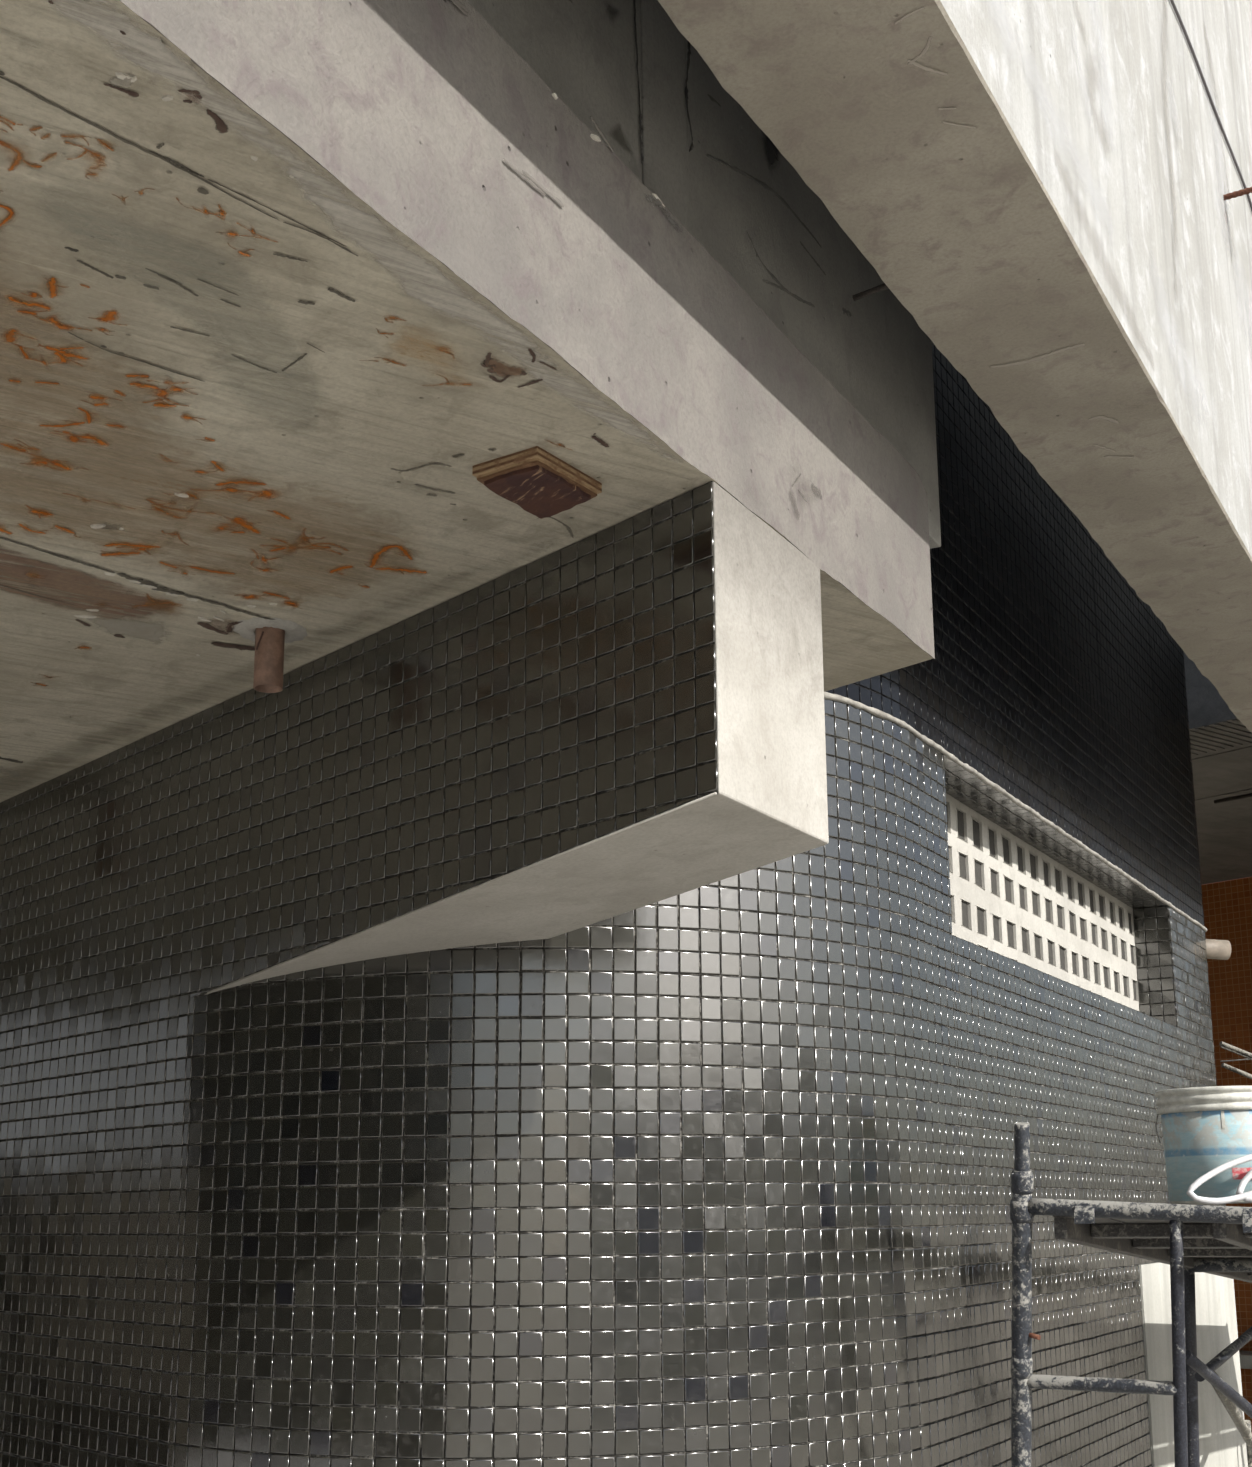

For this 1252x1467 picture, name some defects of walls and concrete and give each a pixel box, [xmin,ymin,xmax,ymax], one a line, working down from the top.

crack [634,0,643,164]
rust [0,116,114,179]
crack [0,71,358,305]
rust [176,198,277,256]
crack [685,41,852,316]
rust [1223,185,1252,223]
rust [5,277,121,384]
rust [40,375,215,445]
crack [68,332,205,382]
crack [65,247,325,373]
rust [0,505,81,538]
rust [63,454,426,588]